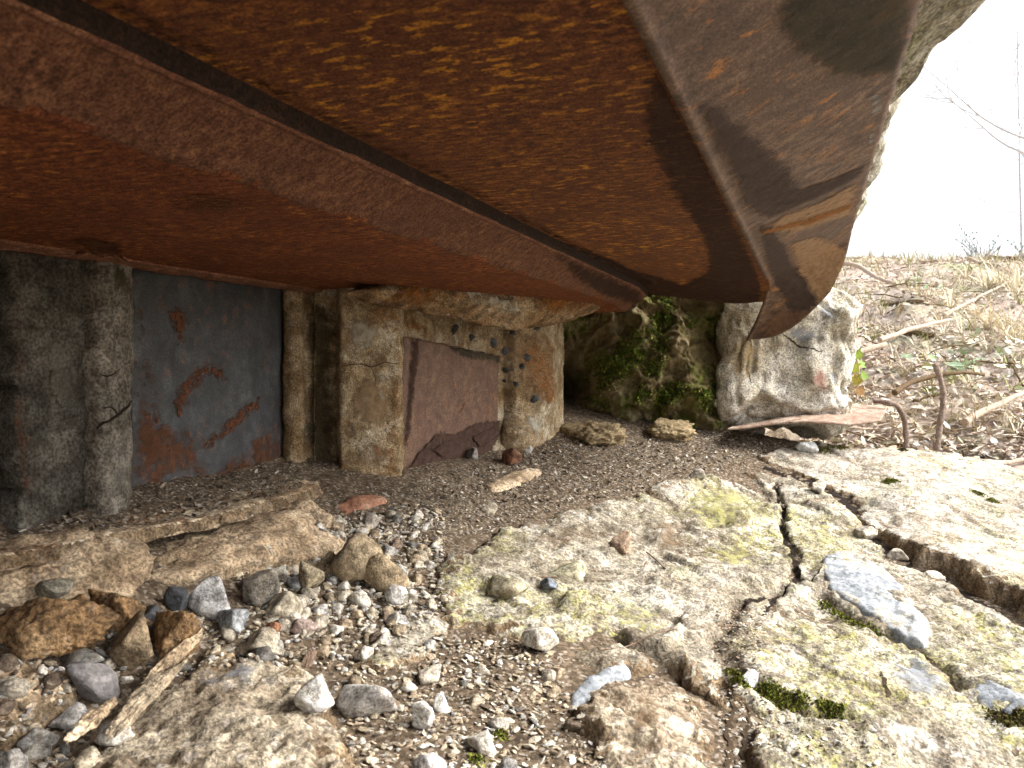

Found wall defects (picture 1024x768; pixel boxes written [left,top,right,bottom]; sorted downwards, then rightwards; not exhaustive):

rust [763,185,858,303]
rust [764,312,807,336]
crack [97,400,132,429]
rust [205,397,261,448]